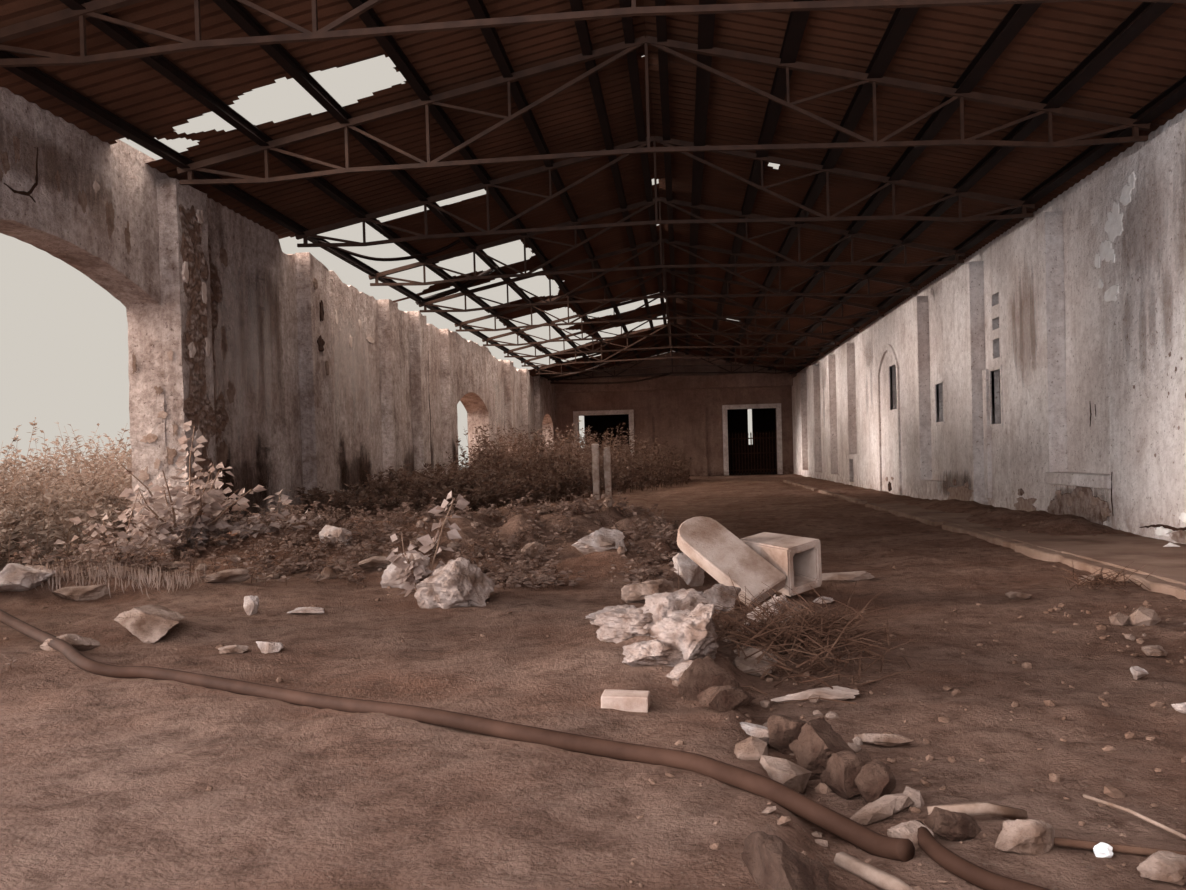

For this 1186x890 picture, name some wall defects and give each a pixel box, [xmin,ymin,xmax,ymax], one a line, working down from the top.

crack [3,147,38,203]
spalling [1155,512,1186,544]